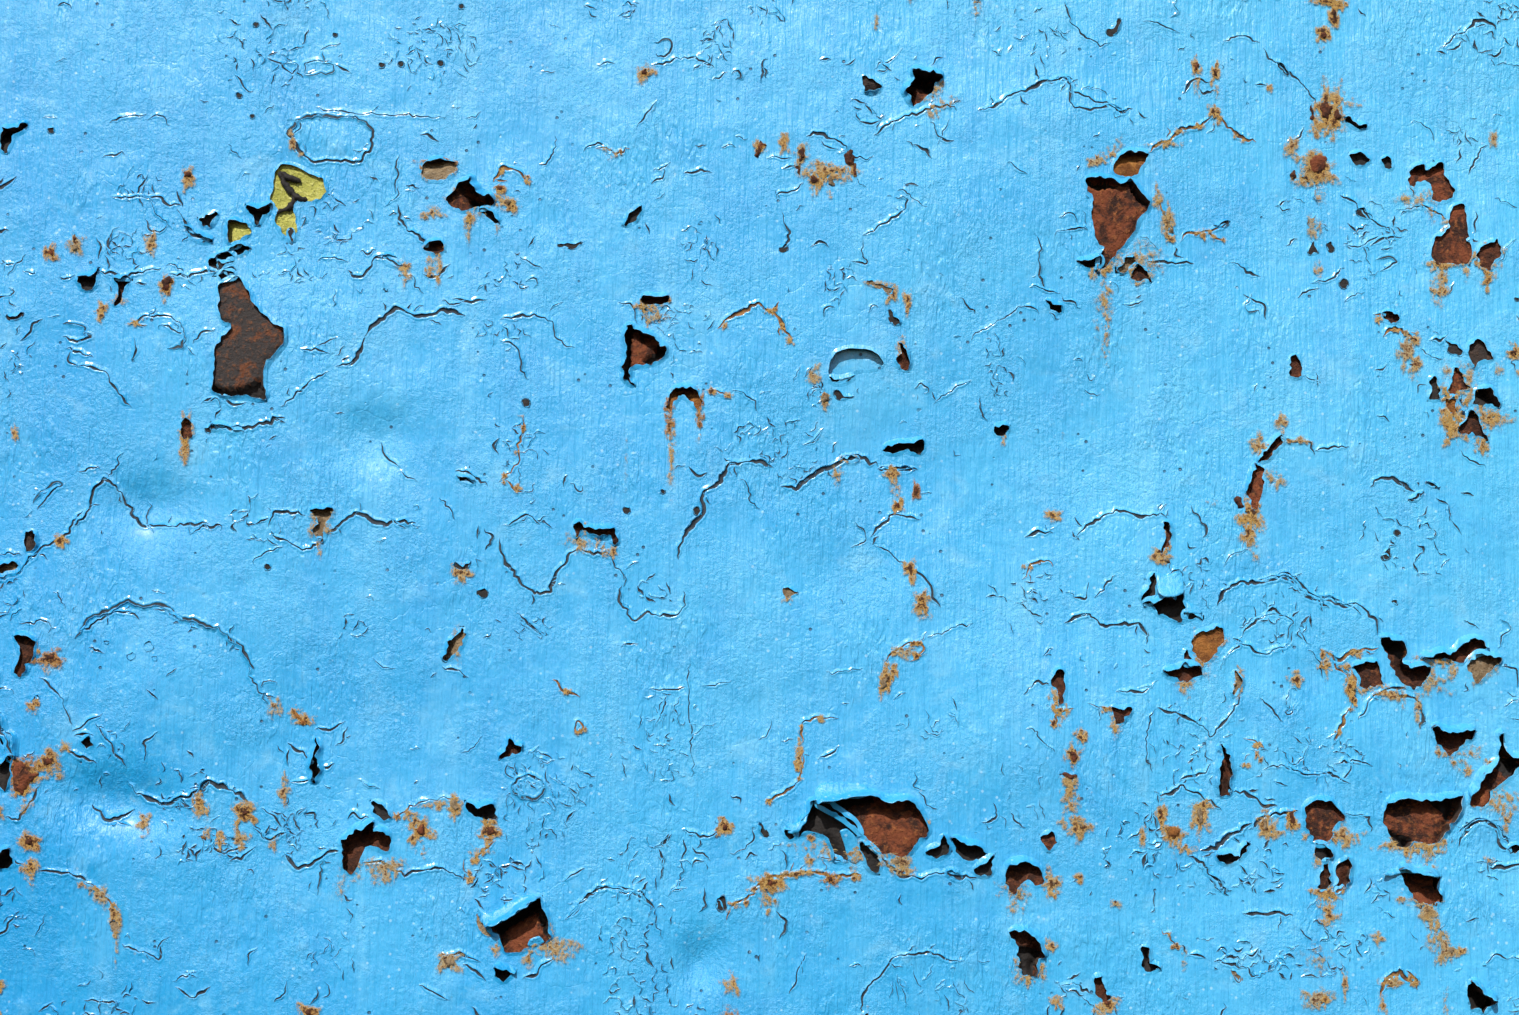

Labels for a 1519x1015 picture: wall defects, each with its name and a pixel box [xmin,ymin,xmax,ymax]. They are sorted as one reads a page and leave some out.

crack [1436,0,1519,69]
peeling [182,161,329,403]
crack [0,0,575,447]
rust [752,132,860,198]
crack [645,0,1318,318]
crack [899,165,1090,424]
peeling [1075,147,1163,286]
rust [1234,496,1265,559]
rust [0,740,69,886]
peeling [758,783,1060,988]
rust [1416,901,1467,965]
peeling [1378,721,1519,908]